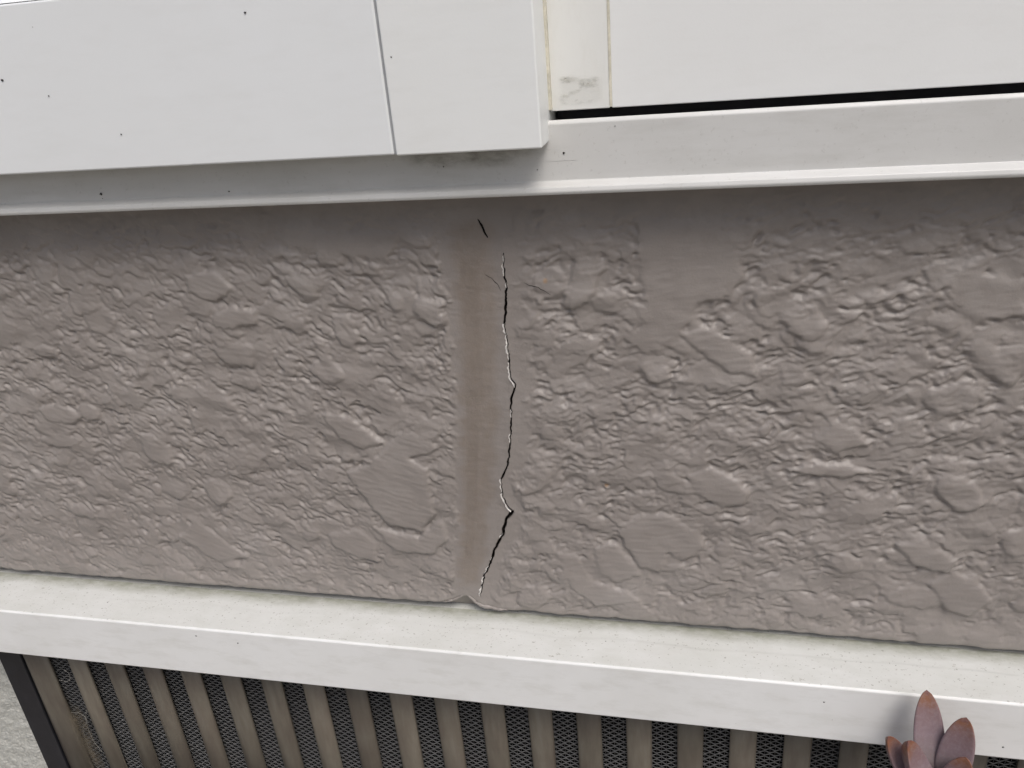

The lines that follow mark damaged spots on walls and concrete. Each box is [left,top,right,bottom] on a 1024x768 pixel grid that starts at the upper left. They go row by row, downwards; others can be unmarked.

crack [478,219,549,596]